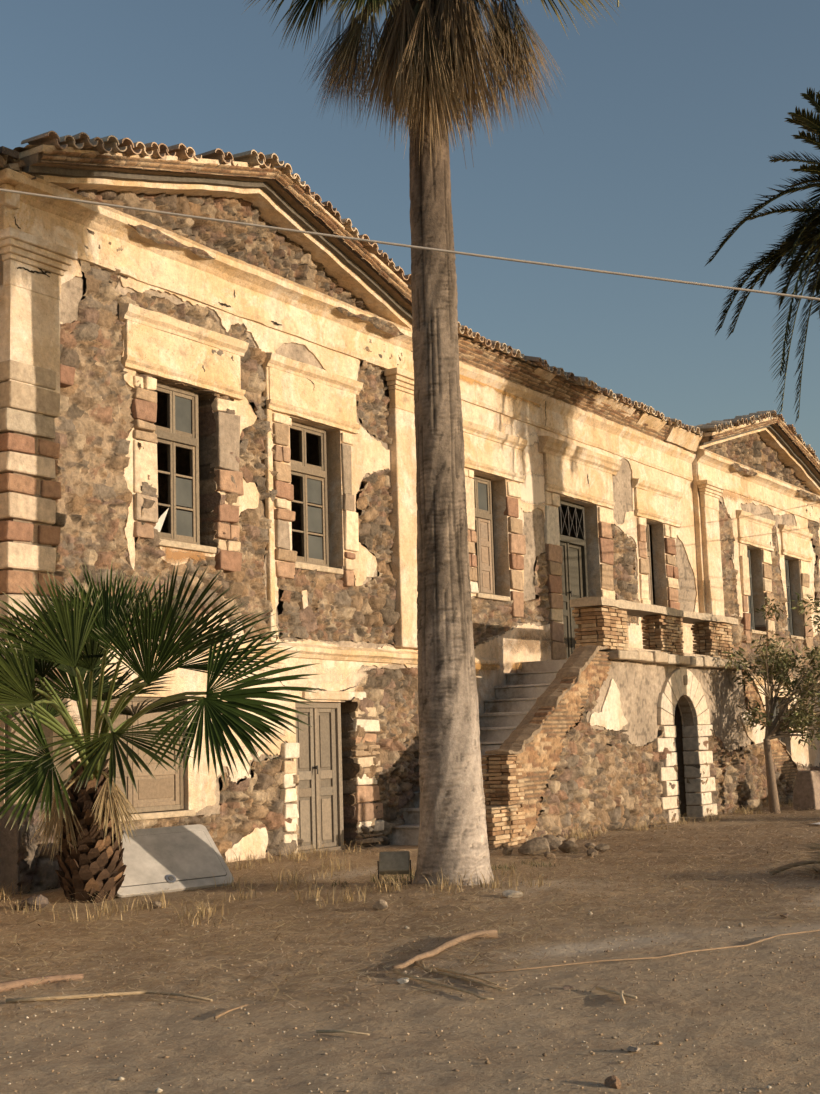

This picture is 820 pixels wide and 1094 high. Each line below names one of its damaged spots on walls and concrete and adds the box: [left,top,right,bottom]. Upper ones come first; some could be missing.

peeling [60,277,83,324]
flaking render [115,275,223,329]
peeling [120,335,136,388]
peeling [232,397,257,435]
peeling [123,426,136,569]
peeling [238,479,259,515]
peeling [333,542,377,586]
peeling [188,554,306,642]
peeling [298,590,308,610]
flaking render [183,746,292,818]
peeling [223,827,268,862]